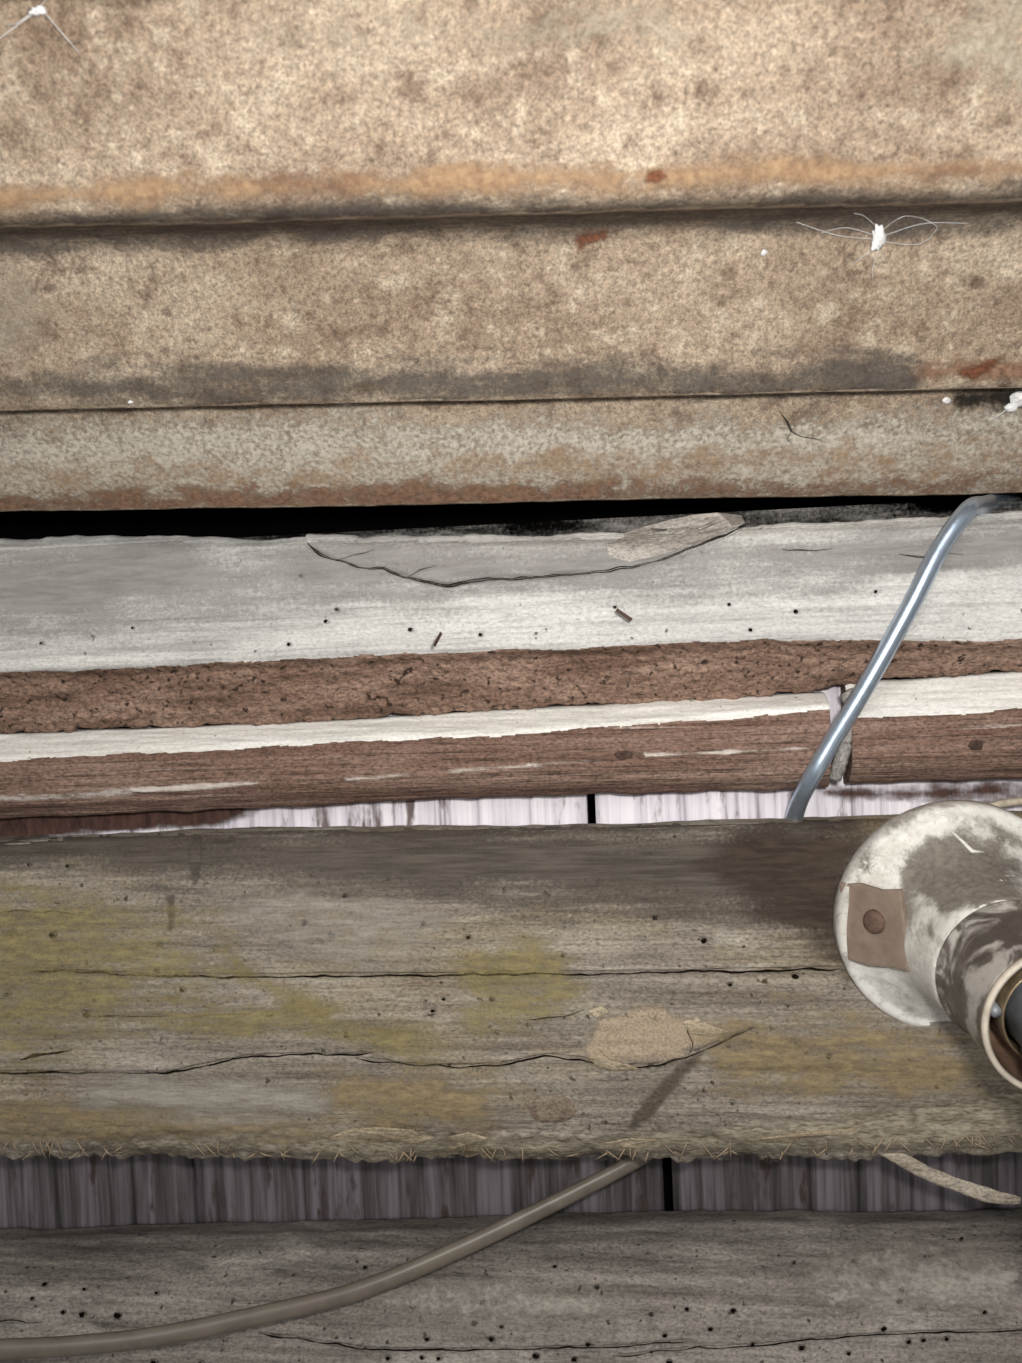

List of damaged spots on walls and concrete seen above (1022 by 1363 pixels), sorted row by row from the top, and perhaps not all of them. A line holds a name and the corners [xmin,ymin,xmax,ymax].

water stain [946,0,1022,80]
corrosion [0,156,1022,210]
crack [307,524,745,587]
water stain [0,808,886,963]
crack [29,967,840,979]
crack [92,1012,163,1020]
crack [0,1050,594,1075]
crack [636,1027,753,1068]
water stain [84,1069,328,1128]
crack [258,1329,1022,1357]